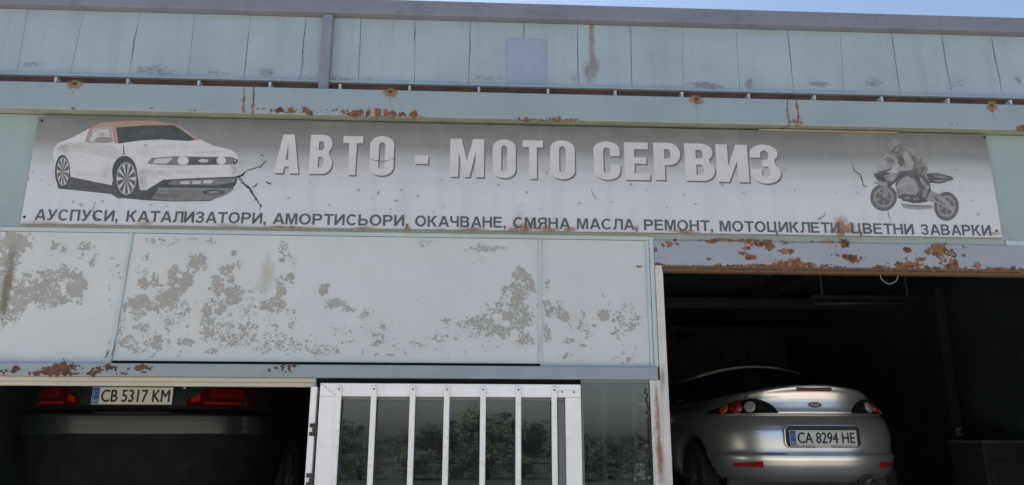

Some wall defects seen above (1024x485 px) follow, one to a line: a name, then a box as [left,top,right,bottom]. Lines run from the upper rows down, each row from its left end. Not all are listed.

corrosion [242,85,422,120]
crack [236,155,271,212]
corrosion [637,219,1024,273]
peeling [0,231,123,331]
peeling [107,236,644,365]
corrosion [0,358,153,378]